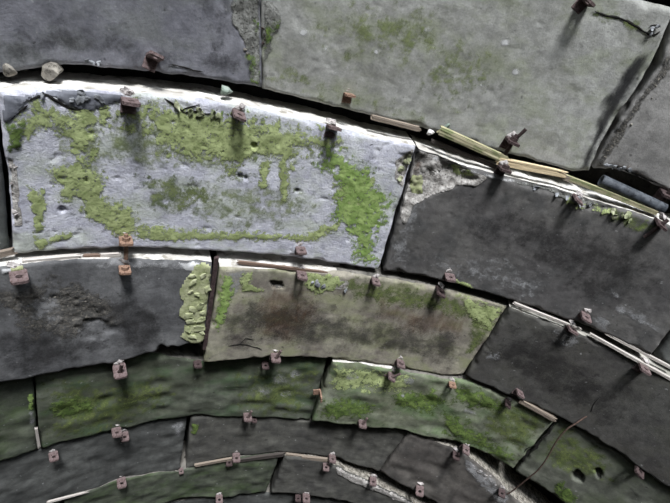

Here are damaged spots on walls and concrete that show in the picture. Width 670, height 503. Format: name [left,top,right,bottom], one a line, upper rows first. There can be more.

spalling [231,0,281,84]
crack [593,11,661,36]
damp [583,57,646,167]
spalling [395,150,487,224]
damp [231,306,370,342]